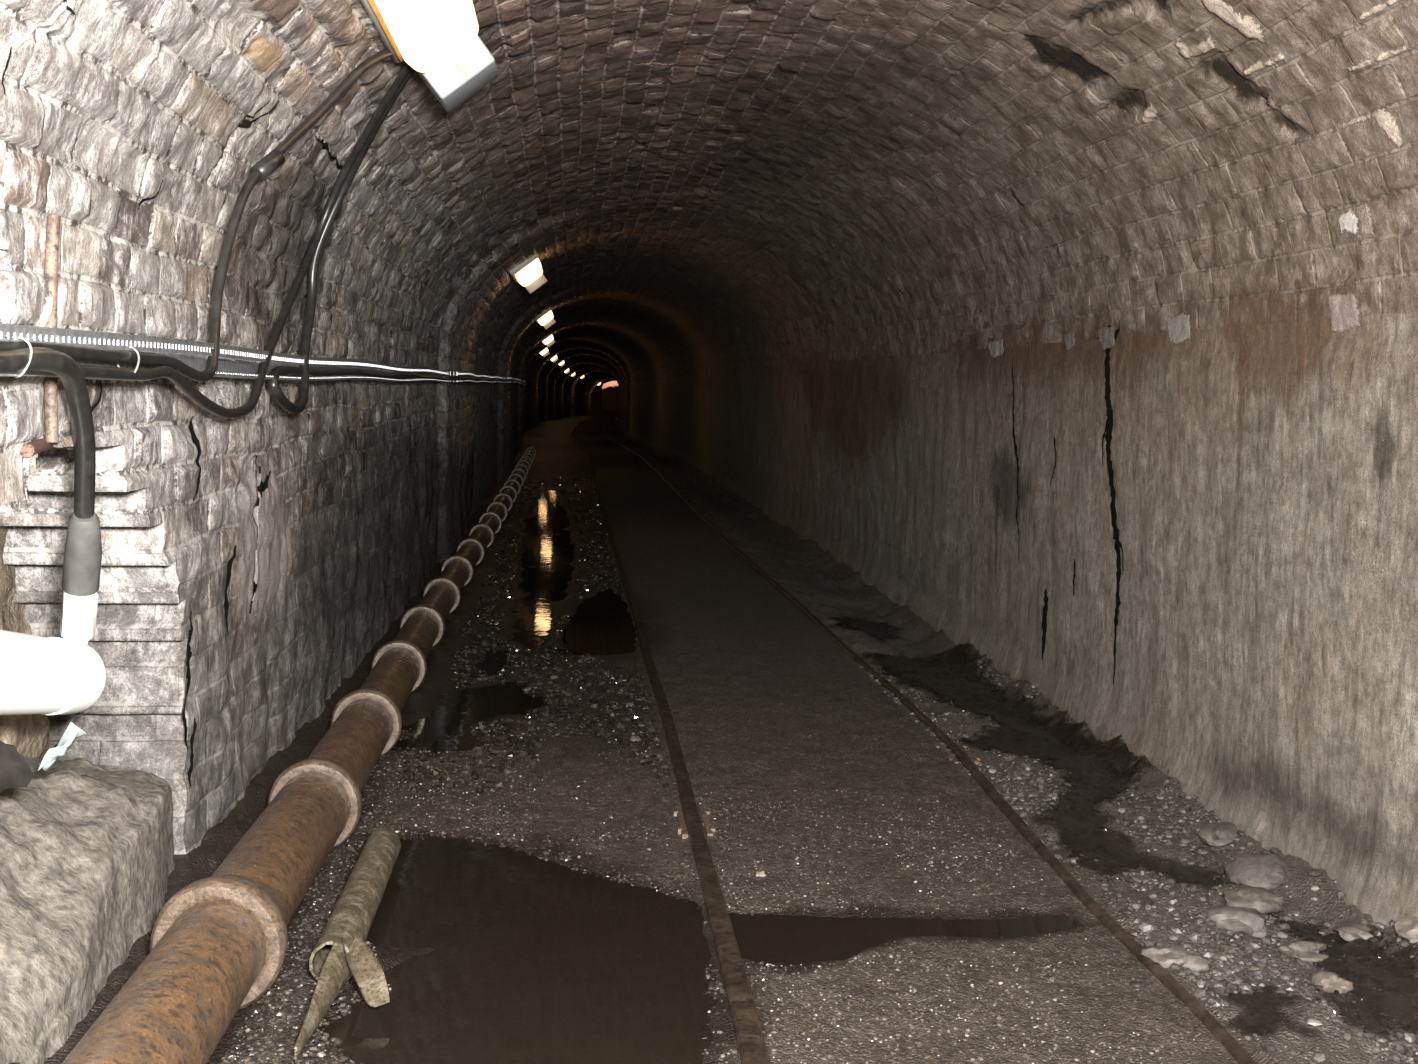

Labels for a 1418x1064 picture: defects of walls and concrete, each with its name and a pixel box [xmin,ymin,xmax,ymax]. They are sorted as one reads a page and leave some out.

spalling [1024,34,1106,83]
spalling [1074,0,1128,21]
spalling [1114,90,1158,124]
spalling [1175,0,1285,101]
spalling [1276,116,1299,131]
crack [1012,362,1056,559]
crack [1102,320,1124,684]
crack [1041,559,1076,660]